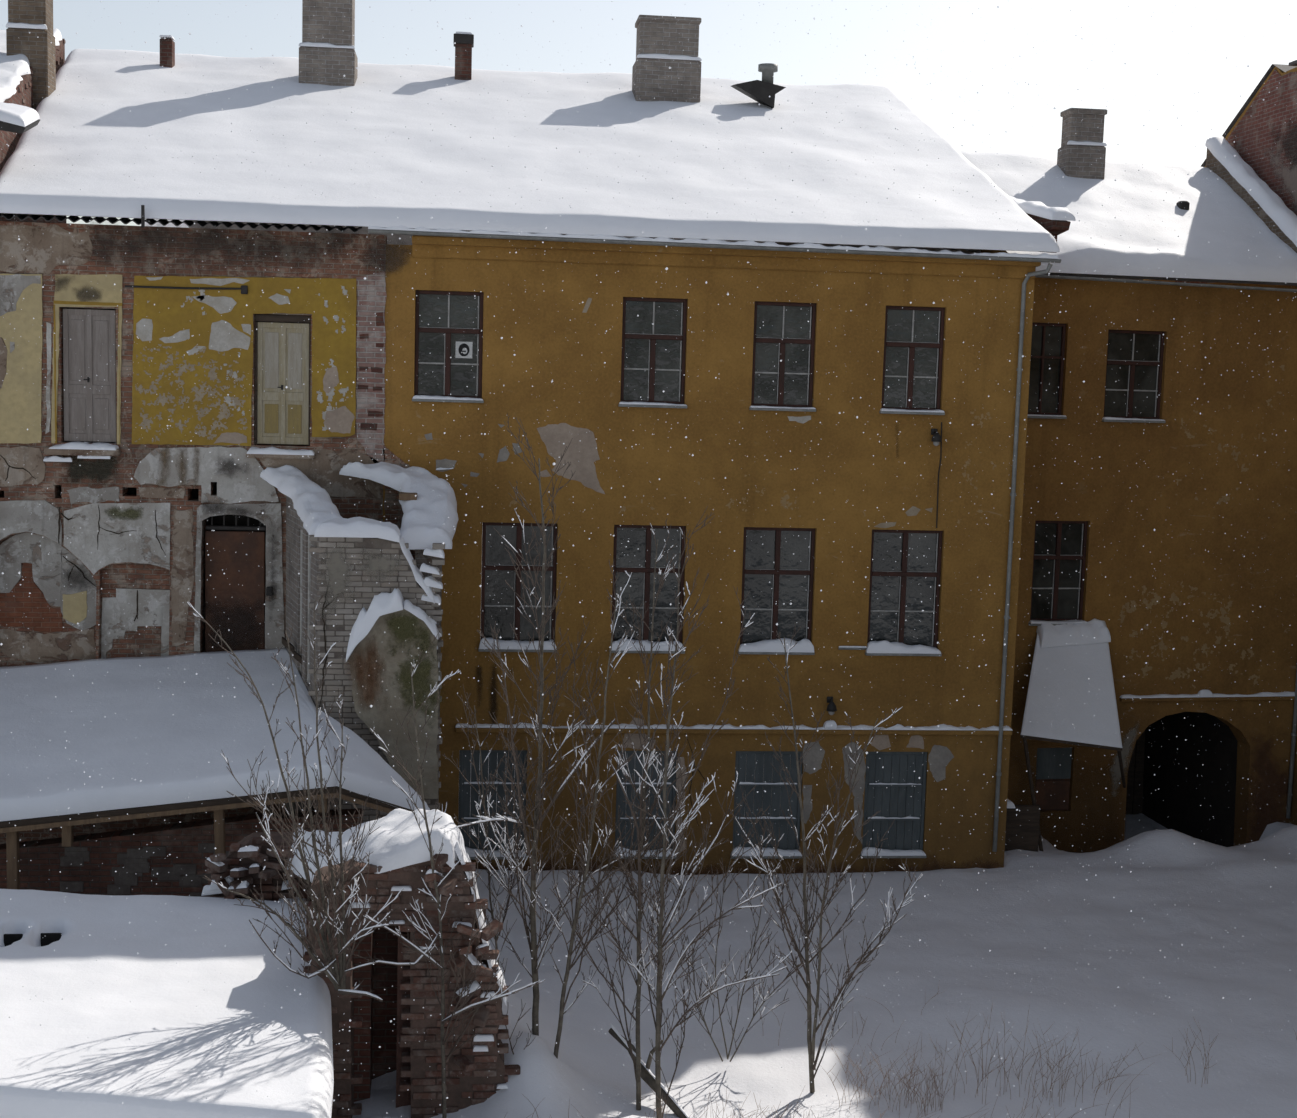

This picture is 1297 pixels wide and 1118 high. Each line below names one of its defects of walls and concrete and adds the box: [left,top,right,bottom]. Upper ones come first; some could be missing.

peeling [0,274,41,316]
peeling [269,289,291,305]
spalling [317,293,385,348]
peeling [135,278,251,444]
peeling [537,423,605,494]
crack [58,505,165,587]
peeling [802,742,825,824]
peeling [842,735,891,843]
peeling [907,735,954,782]